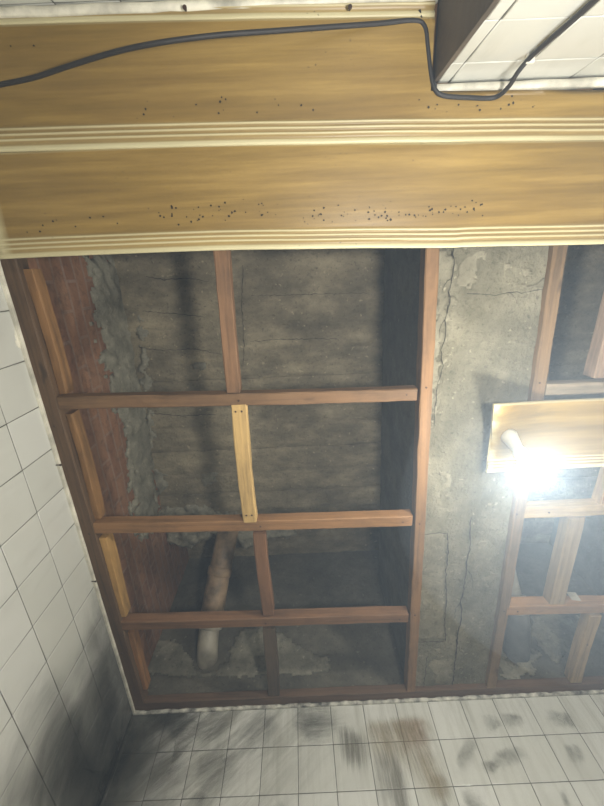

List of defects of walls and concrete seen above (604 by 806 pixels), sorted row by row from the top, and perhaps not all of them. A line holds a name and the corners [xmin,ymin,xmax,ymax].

peeling [82,254,142,393]
peeling [111,407,242,516]
crack [423,518,473,687]